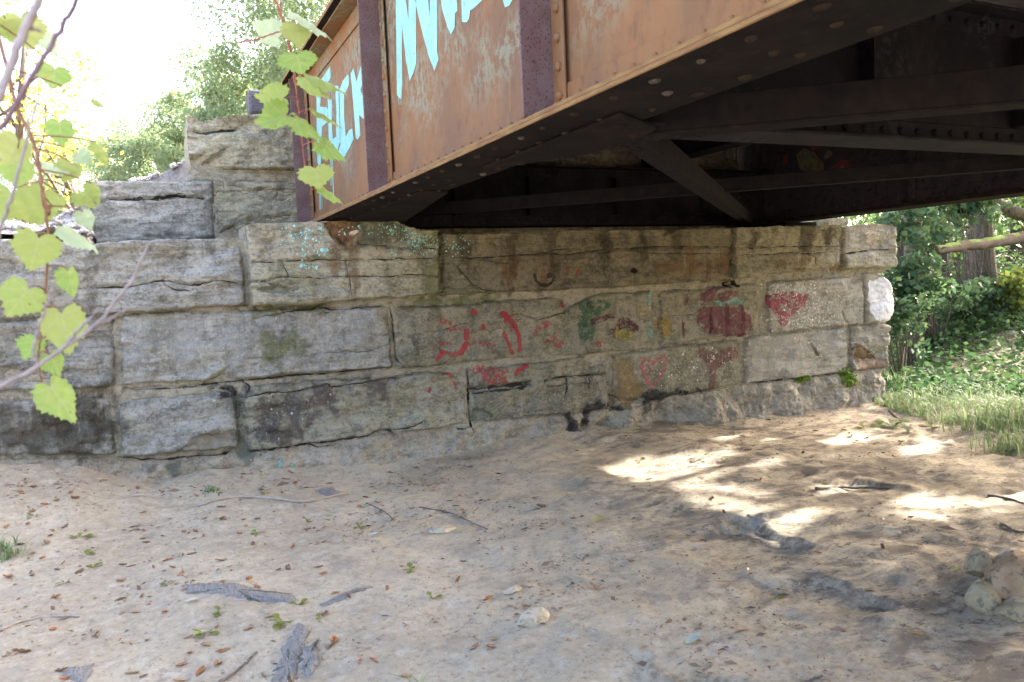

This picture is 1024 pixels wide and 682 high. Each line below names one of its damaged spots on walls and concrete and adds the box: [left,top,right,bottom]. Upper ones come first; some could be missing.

crack [113,193,204,201]
water stain [357,221,409,249]
crack [101,241,888,398]
crack [457,374,643,430]
crack [127,422,423,461]